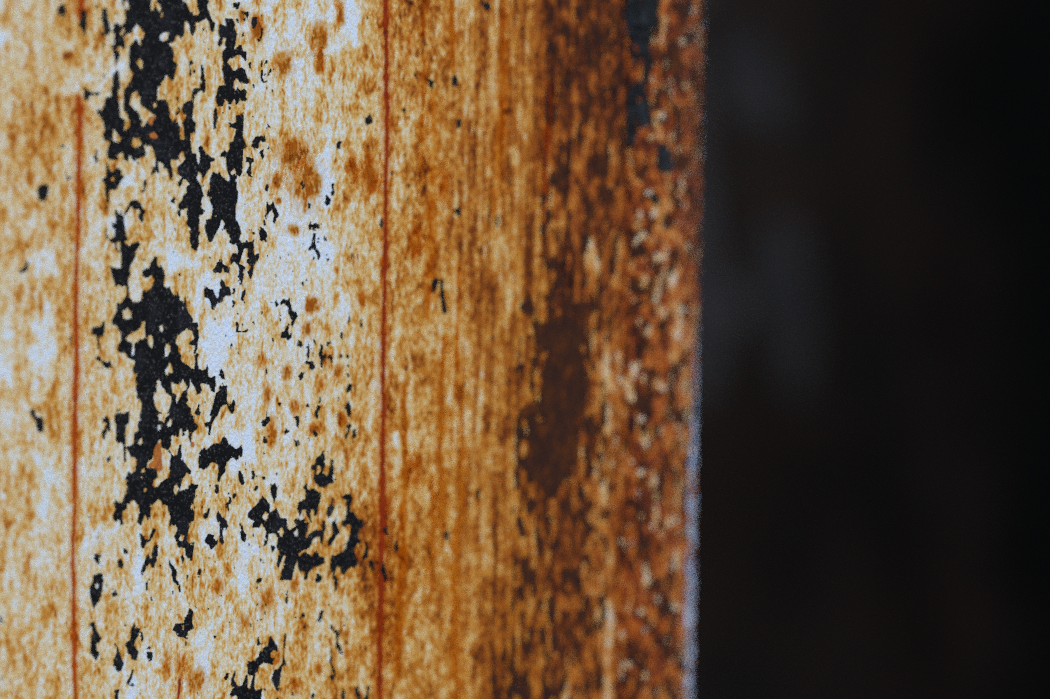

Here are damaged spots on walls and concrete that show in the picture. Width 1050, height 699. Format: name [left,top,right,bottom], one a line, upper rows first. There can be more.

peeling [414,70,458,89]
peeling [606,0,669,157]
peeling [38,183,49,201]
rust [284,141,318,211]
peeling [656,139,673,191]
peeling [30,409,44,433]
rust [71,95,84,699]
peeling [57,0,387,699]
rust [306,298,317,333]
rust [351,0,390,699]
rust [492,0,704,699]
rust [429,351,464,698]